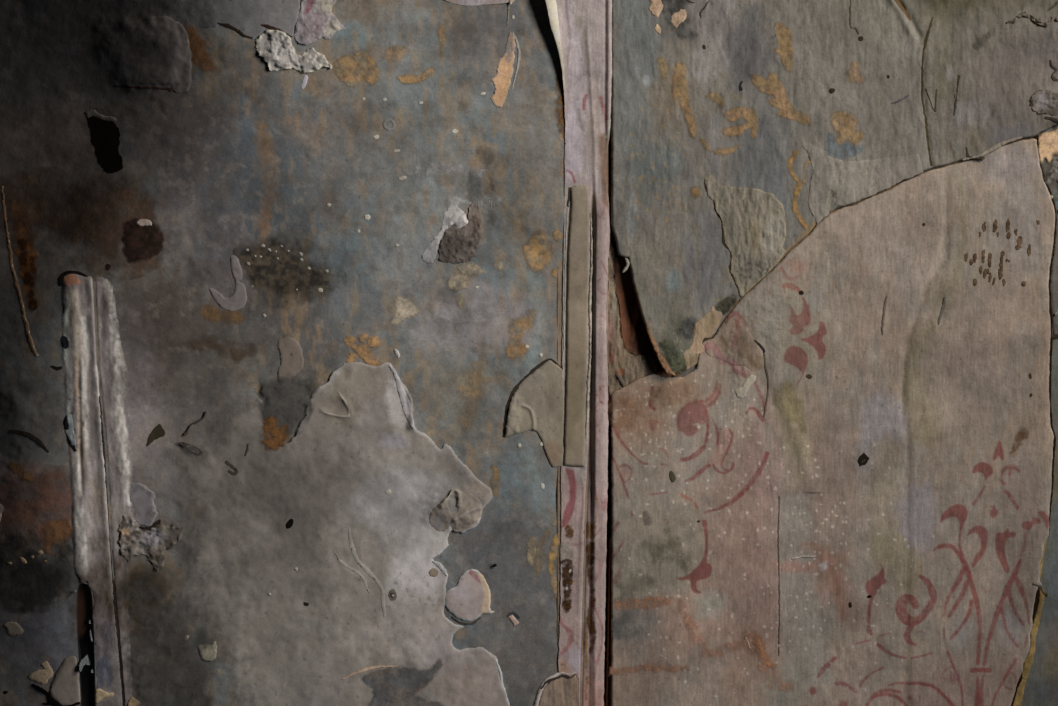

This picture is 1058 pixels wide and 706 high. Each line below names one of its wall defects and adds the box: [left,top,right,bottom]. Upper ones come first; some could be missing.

peeling [203,0,407,87]
spalling [85,110,123,173]
corrosion [0,174,166,310]
peeling [503,358,564,467]
crack [754,340,769,417]
peeling [118,334,509,706]